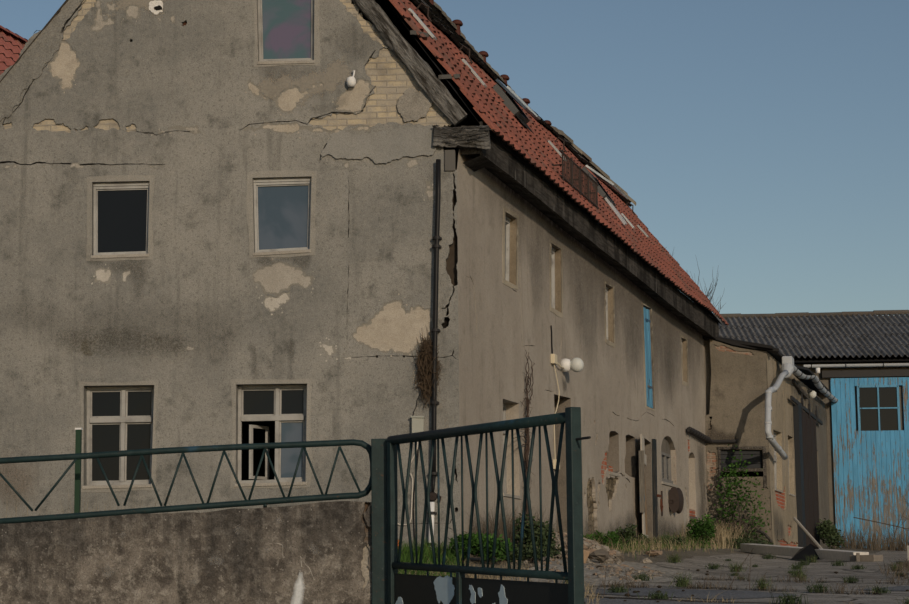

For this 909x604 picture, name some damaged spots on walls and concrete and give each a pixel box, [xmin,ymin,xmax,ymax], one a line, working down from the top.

flaking render [47,0,175,93]
spalling [242,0,451,139]
flaking render [252,258,315,315]
flaking render [351,293,433,357]
crack [445,175,458,316]
spalling [587,452,616,537]